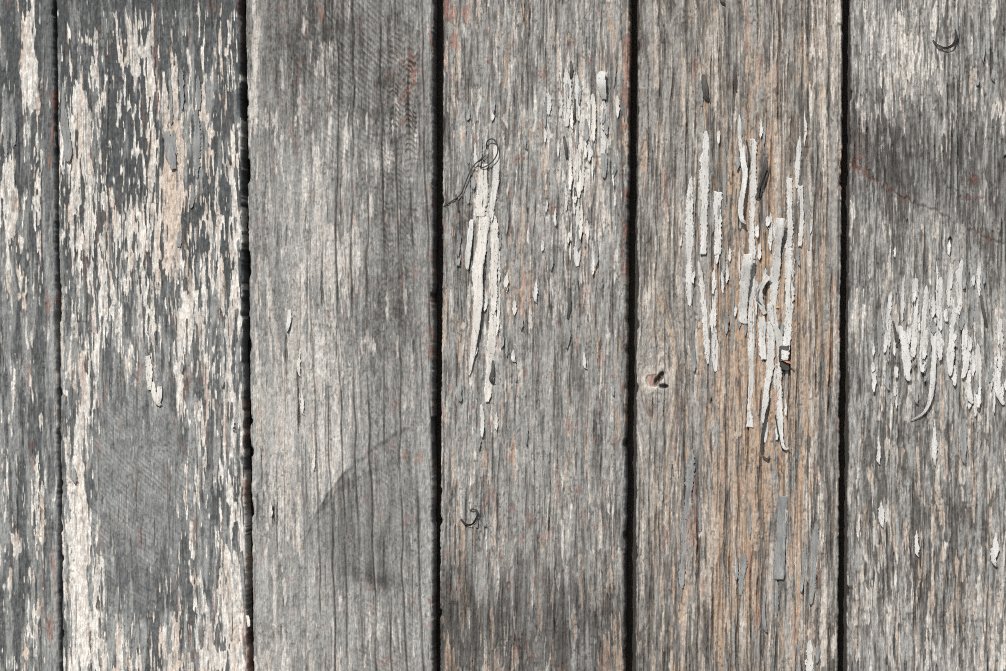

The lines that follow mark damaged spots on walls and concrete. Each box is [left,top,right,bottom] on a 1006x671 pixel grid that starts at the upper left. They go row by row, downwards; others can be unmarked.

peeling [855,0,959,130]
peeling [59,0,271,407]
peeling [453,108,524,450]
peeling [533,58,625,348]
peeling [680,0,842,460]
peeling [871,260,1006,467]
peeling [0,451,46,671]
peeling [55,399,315,671]
peeling [330,617,380,671]